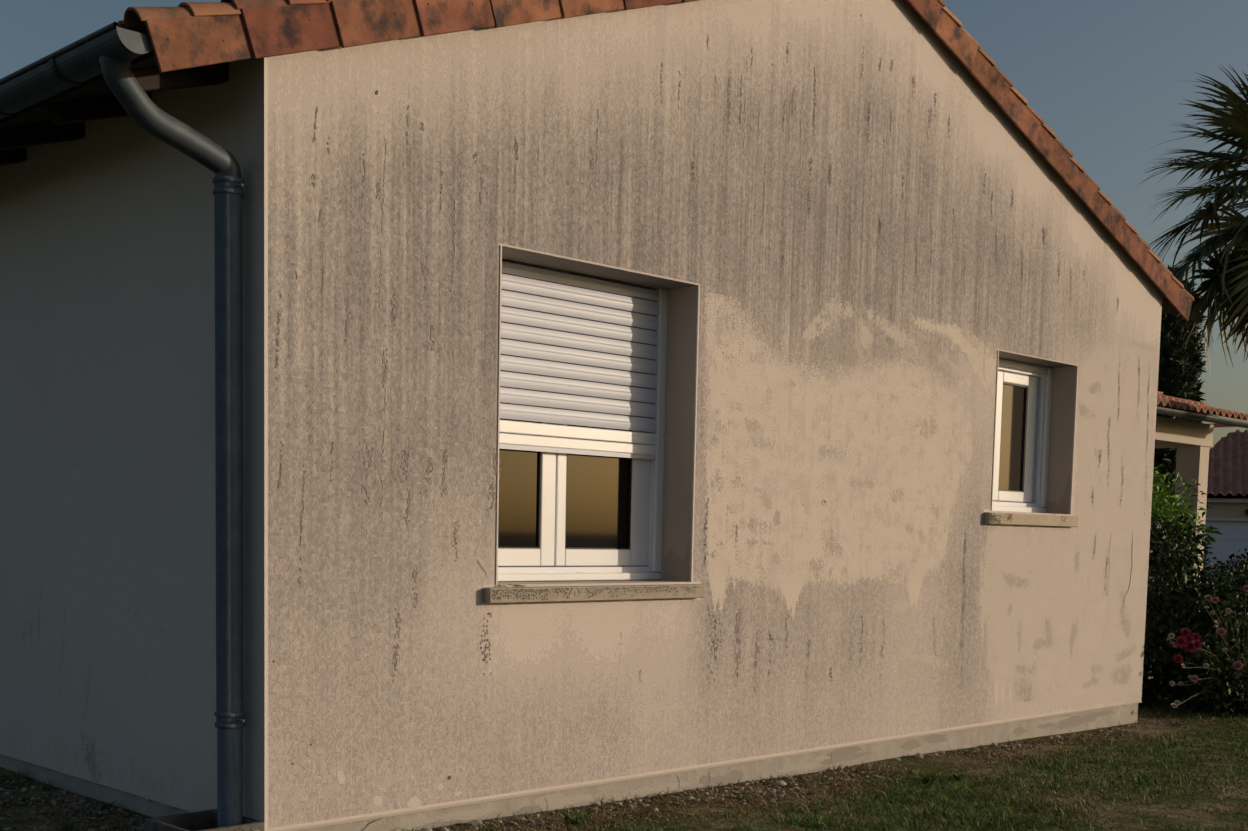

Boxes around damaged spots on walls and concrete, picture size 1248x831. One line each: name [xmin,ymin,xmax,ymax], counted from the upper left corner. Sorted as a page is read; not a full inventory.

damp [1047,473,1071,514]
damp [663,498,709,582]
damp [708,605,789,690]